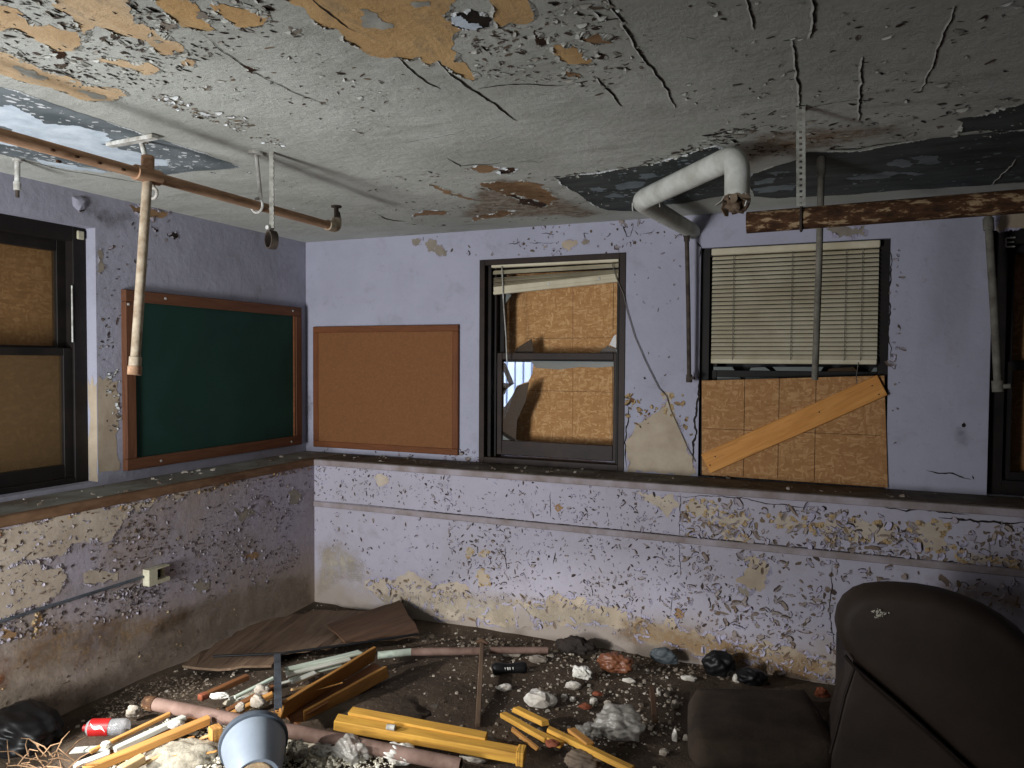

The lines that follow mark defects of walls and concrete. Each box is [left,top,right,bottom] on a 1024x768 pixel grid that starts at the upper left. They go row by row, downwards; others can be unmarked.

peeling [0,0,653,175]
crack [398,58,569,167]
crack [599,0,676,108]
peeling [369,61,1024,269]
crack [745,0,755,30]
crack [784,0,867,122]
crack [919,6,956,91]
peeling [97,236,149,360]
peeling [624,377,697,476]
water stain [0,548,359,708]
peeling [0,466,1024,702]